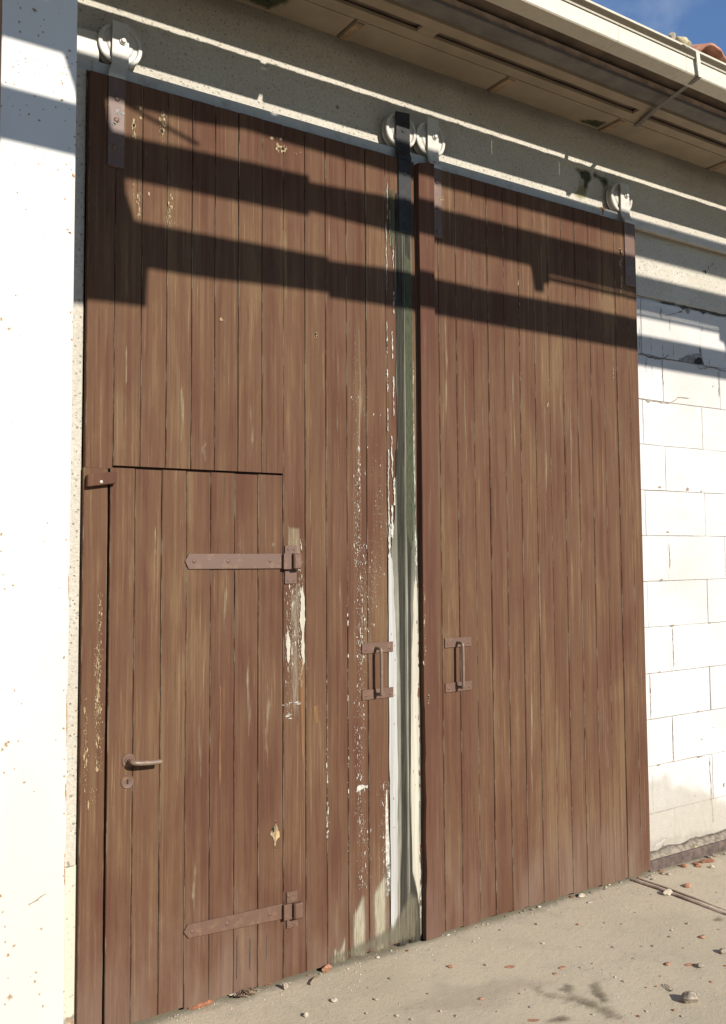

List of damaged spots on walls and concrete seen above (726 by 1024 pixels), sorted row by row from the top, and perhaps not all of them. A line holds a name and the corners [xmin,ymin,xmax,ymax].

peeling [386,184,395,324]
peeling [83,592,103,808]
peeling [282,569,305,719]
peeling [334,336,429,963]